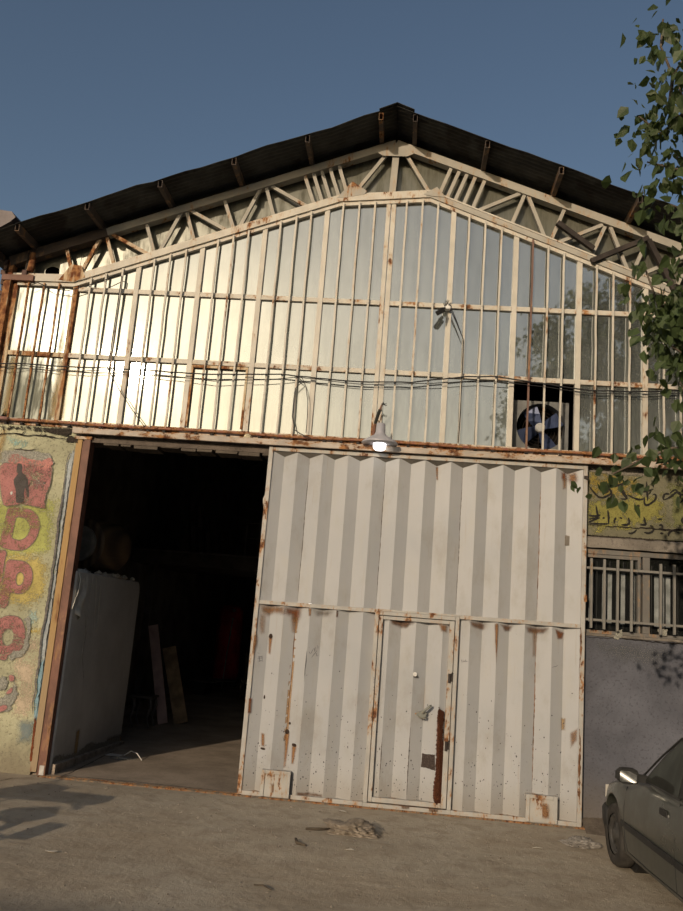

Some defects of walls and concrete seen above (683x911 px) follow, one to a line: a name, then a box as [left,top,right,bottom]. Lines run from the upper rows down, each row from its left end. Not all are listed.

spalling [0,426,78,443]
corrosion [263,607,338,739]
corrosion [392,707,445,812]